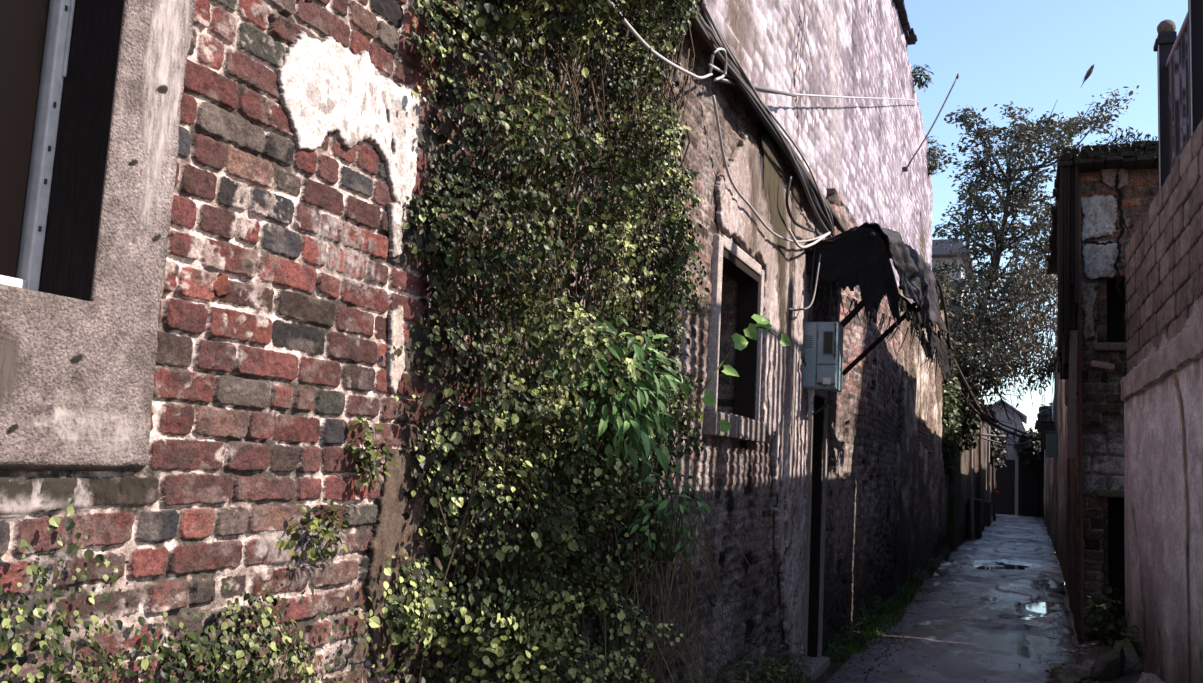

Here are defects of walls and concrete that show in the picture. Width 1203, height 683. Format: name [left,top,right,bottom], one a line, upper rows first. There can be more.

peeling [276,30,421,258]